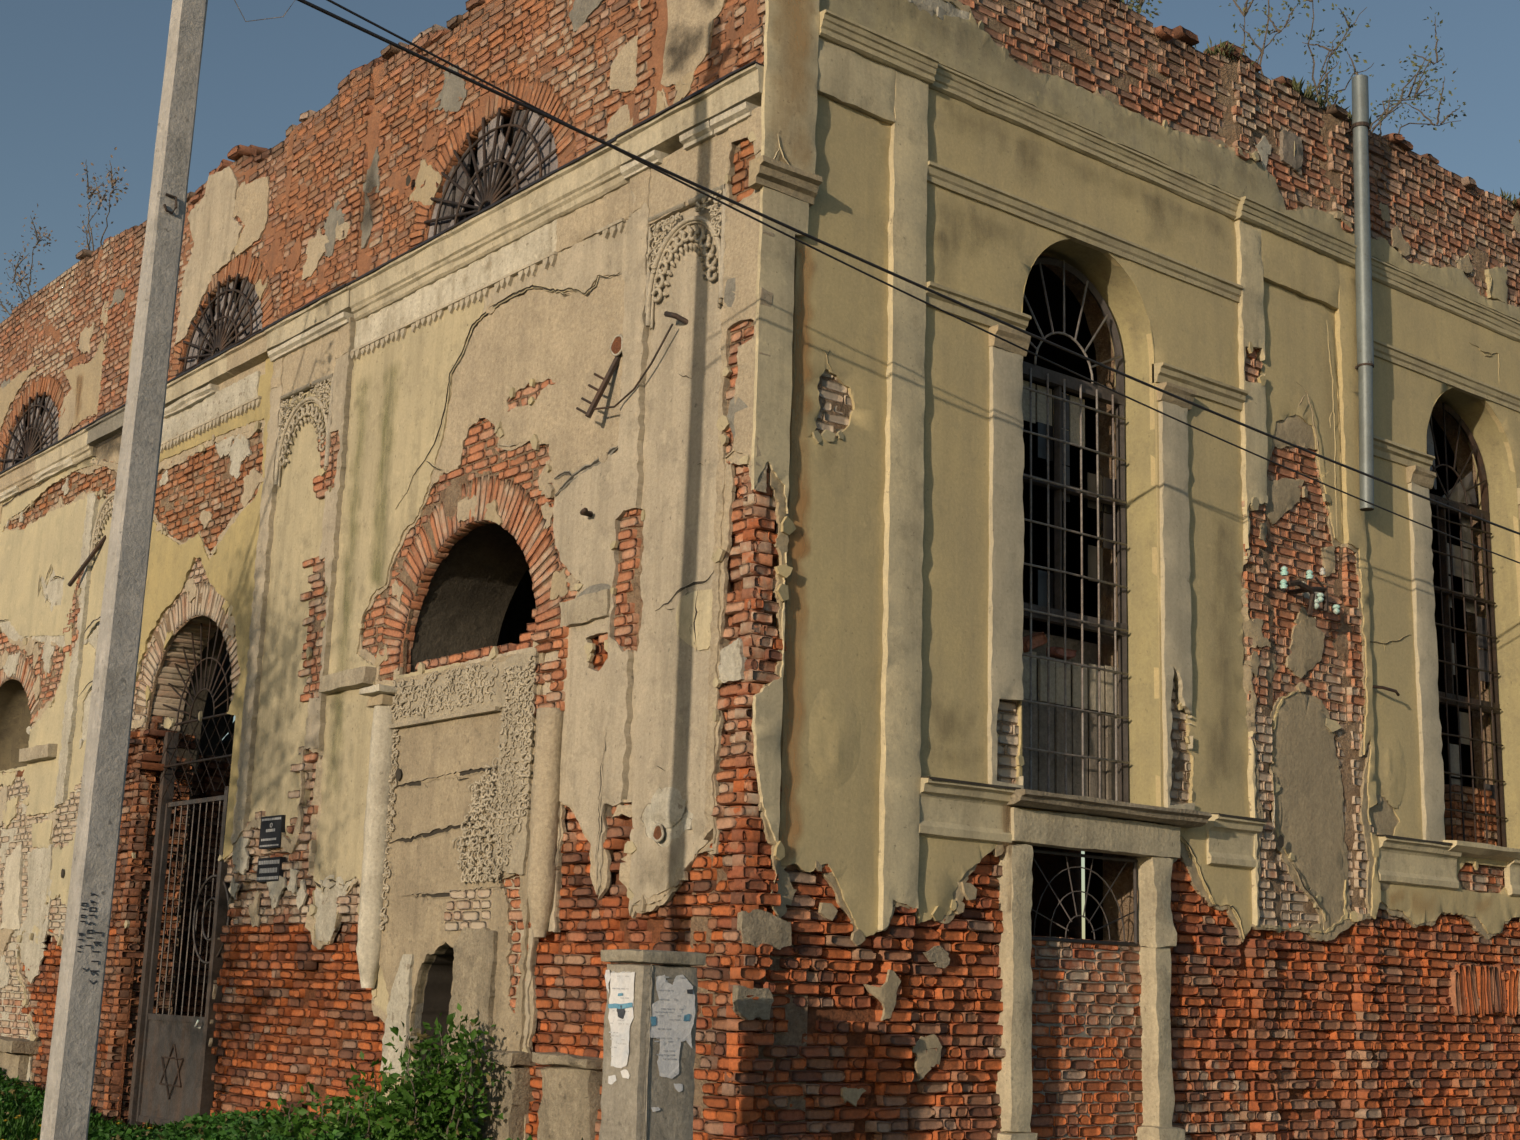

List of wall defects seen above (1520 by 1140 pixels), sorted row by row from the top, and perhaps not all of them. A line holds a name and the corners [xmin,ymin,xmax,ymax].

flaking render [0,220,147,471]
flaking render [167,0,766,381]
flaking render [357,274,646,716]
crack [396,272,620,509]
flaking render [0,768,82,1091]
flaking render [91,420,266,1122]
flaking render [208,746,388,1123]
crack [389,822,475,845]
crack [395,766,498,788]
crack [404,885,505,899]
flaking render [502,320,1009,1140]
flaking render [1170,415,1520,1140]